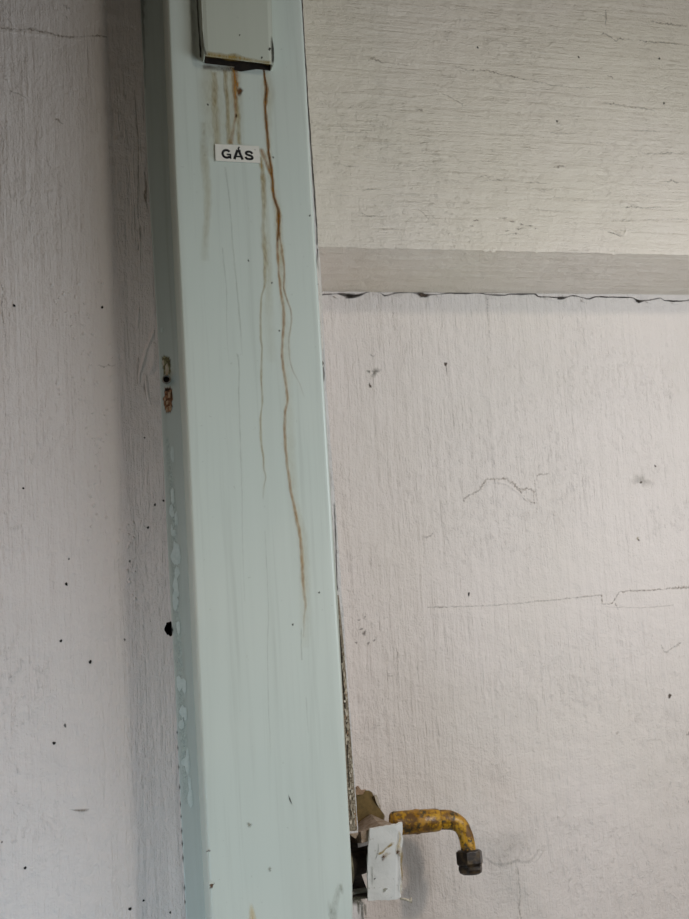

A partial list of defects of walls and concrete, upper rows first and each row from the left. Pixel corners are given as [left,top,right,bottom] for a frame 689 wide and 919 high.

rust [208,54,248,99]
rust [260,62,280,259]
crack [322,292,682,304]
rust [162,356,171,375]
rust [163,387,173,413]